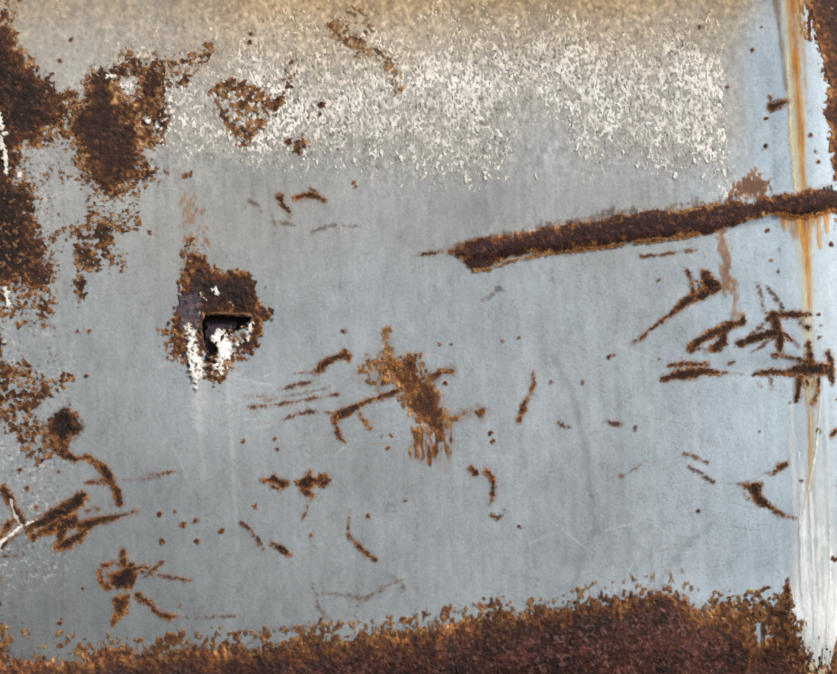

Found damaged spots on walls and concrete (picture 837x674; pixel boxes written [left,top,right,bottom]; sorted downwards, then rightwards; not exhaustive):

rust [208,58,298,147]
rust [439,0,837,306]
rust [0,0,214,471]
rust [170,246,274,387]
rust [358,326,485,466]
rust [800,411,821,482]
rust [0,573,837,674]